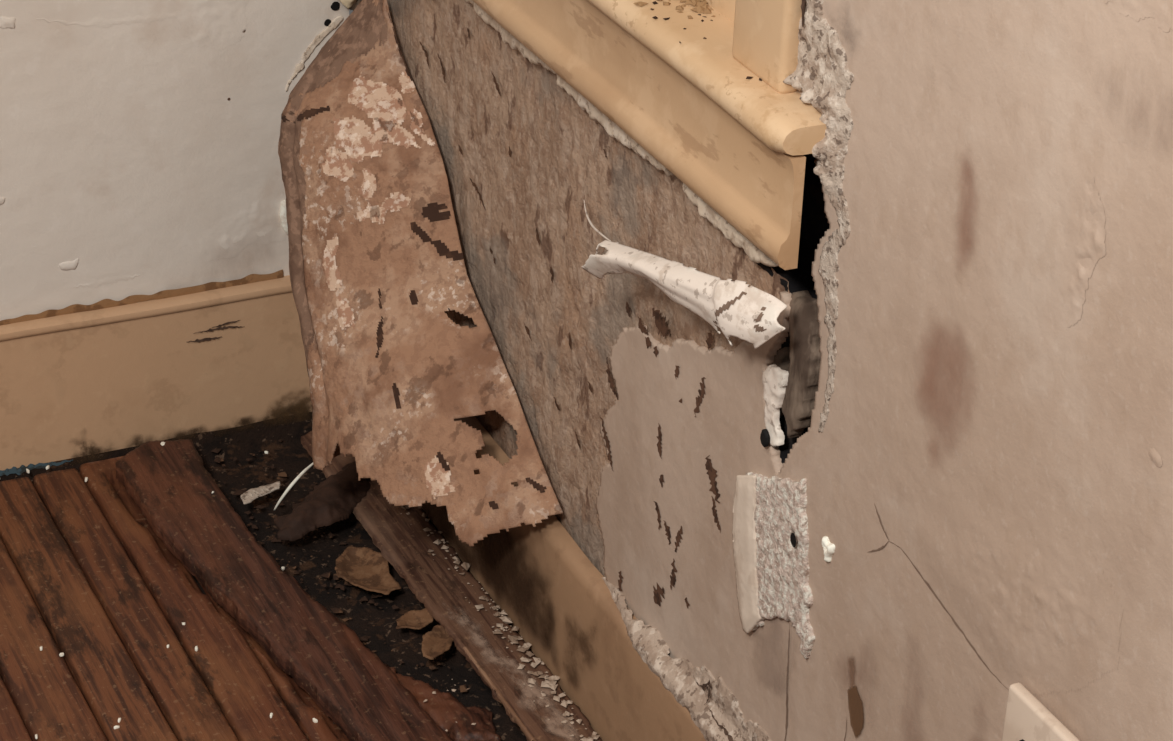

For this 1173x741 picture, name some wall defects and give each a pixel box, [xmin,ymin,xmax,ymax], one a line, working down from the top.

peeling [280,200,288,235]
flaking render [322,0,854,741]
crack [869,504,1006,688]